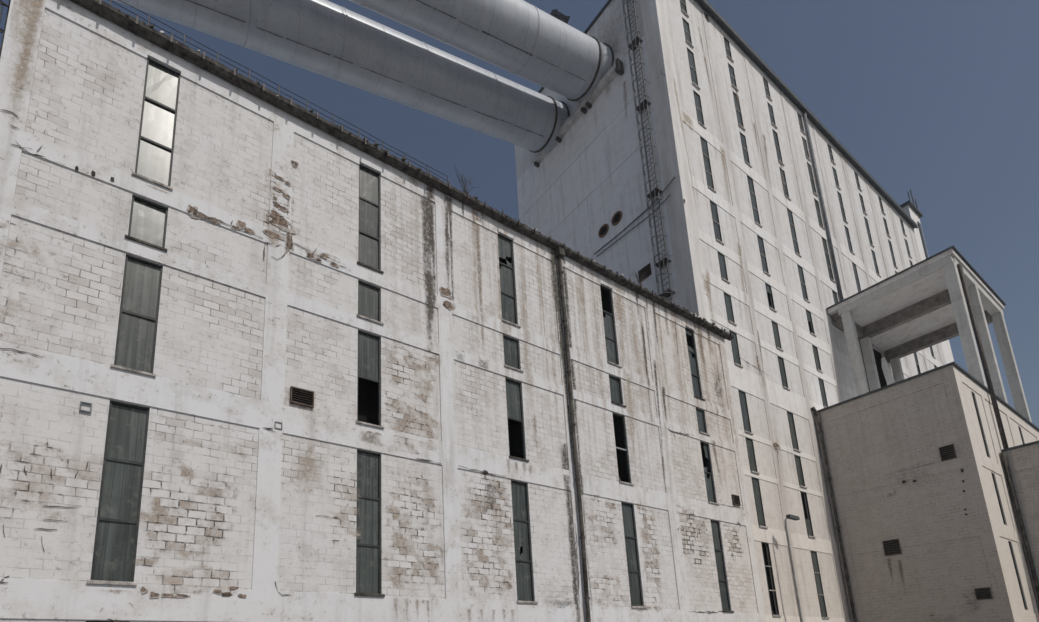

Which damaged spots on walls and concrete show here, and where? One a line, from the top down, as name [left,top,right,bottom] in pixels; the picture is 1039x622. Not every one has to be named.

leakage [187,0,544,137]
leakage [416,0,586,81]
spalling [187,172,296,253]
spalling [306,249,340,268]
leakage [421,187,483,338]
peeling [386,349,439,442]
peeling [145,480,229,556]
peeling [465,470,512,591]
peeling [678,510,708,564]
spalling [140,572,246,598]